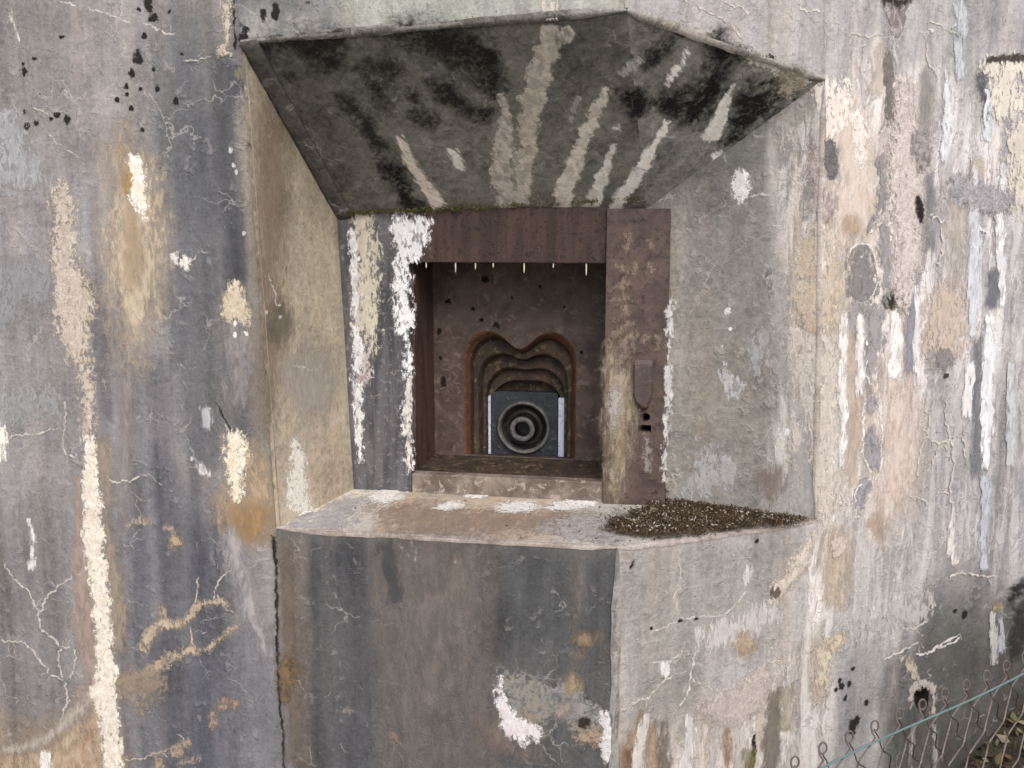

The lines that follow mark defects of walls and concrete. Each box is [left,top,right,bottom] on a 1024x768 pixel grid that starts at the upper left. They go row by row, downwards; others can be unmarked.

leakage [334,93,447,210]
leakage [384,0,576,208]
leakage [551,25,786,209]
peeling [947,51,1024,233]
peeling [347,212,434,475]
corrosion [464,307,584,459]
corrosion [602,345,653,504]
spalling [741,0,934,509]
crack [2,562,82,725]
crack [110,566,239,718]
crack [271,535,285,768]
spalling [480,666,616,764]